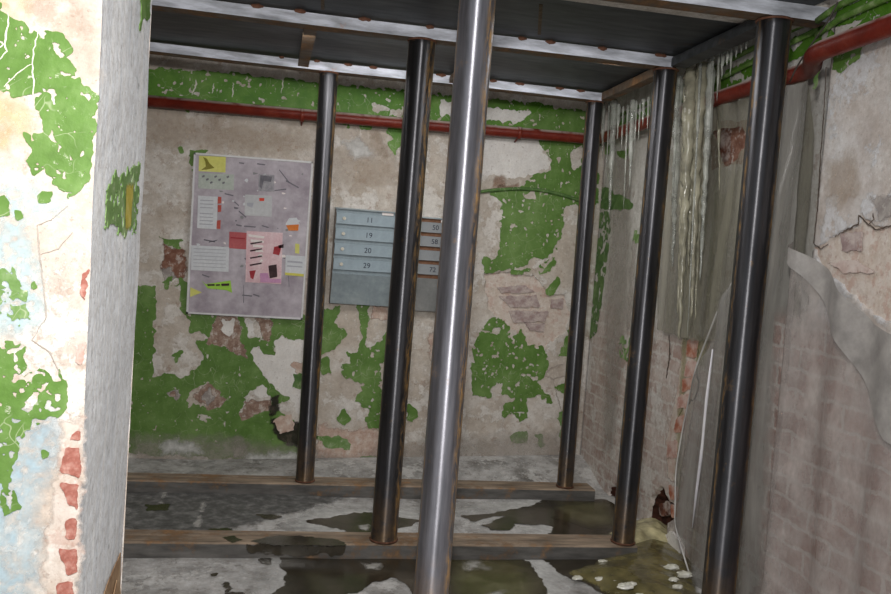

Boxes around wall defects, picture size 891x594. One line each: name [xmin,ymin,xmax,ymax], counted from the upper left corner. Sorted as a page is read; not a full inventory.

crack [0,13,41,102]
peeling [148,67,319,110]
peeling [336,85,405,117]
peeling [104,161,141,239]
peeling [0,2,100,594]
peeling [129,236,305,459]
peeling [316,305,388,458]
peeling [470,98,586,448]
spalling [766,323,891,594]
damp [125,492,419,594]
damp [449,559,609,594]
damp [461,495,615,535]